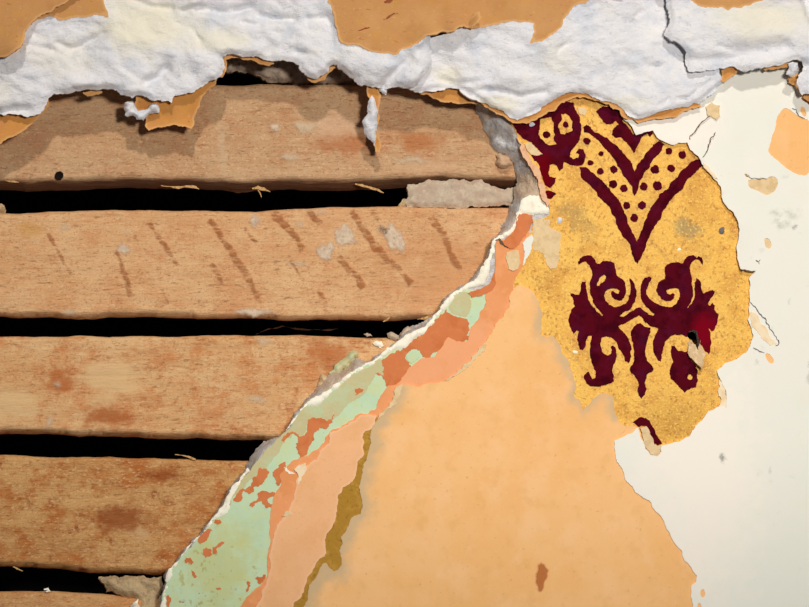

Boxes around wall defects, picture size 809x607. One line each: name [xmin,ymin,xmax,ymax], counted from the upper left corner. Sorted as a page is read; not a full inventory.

peeling [162,272,496,607]
peeling [503,213,533,265]
peeling [614,62,809,607]